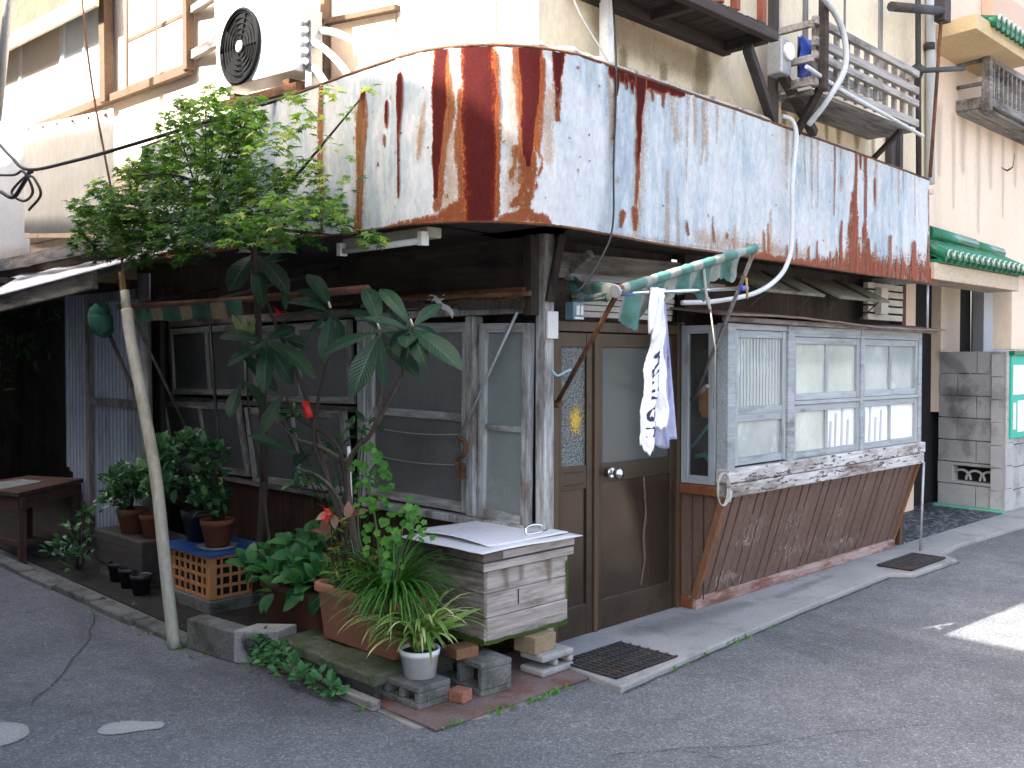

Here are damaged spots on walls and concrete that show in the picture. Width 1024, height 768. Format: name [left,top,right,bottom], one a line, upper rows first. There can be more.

corrosion [353,72,403,231]
corrosion [385,47,566,227]
corrosion [608,66,685,231]
corrosion [746,146,938,284]
peeling [731,445,924,493]